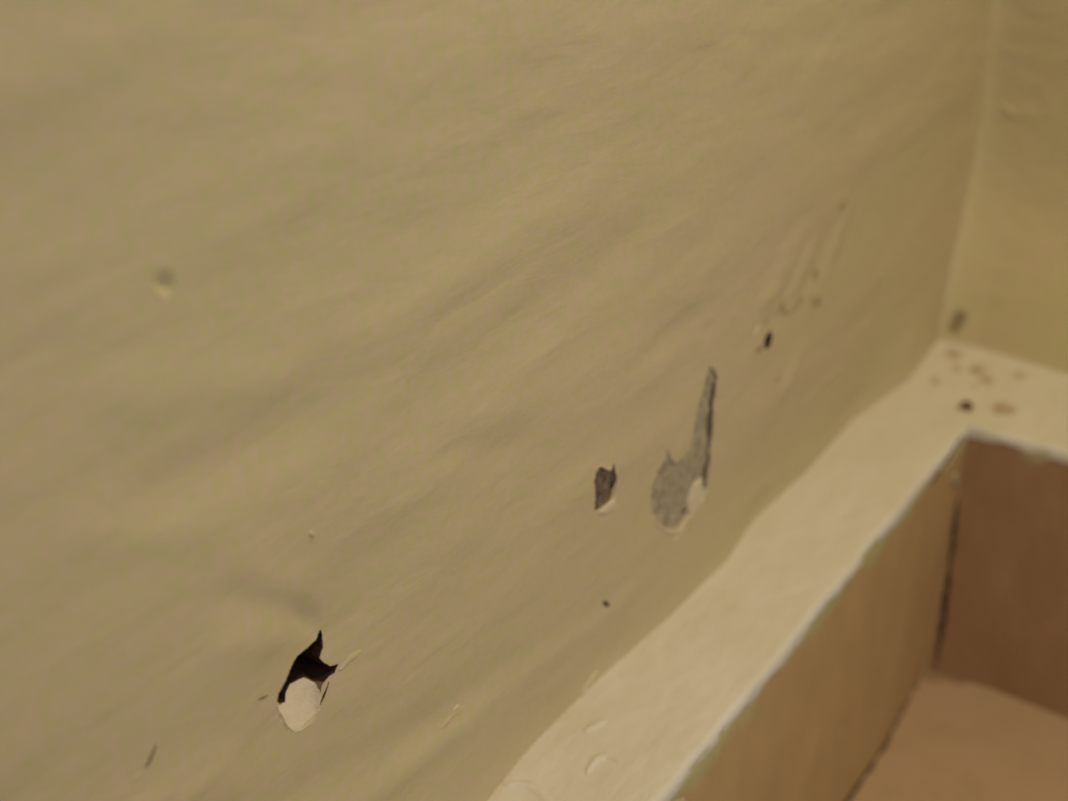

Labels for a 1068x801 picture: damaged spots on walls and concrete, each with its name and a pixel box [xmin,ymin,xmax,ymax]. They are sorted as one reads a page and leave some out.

spalling [594,464,617,514]
peeling [651,365,718,541]
spalling [258,630,361,734]
crack [846,436,963,801]